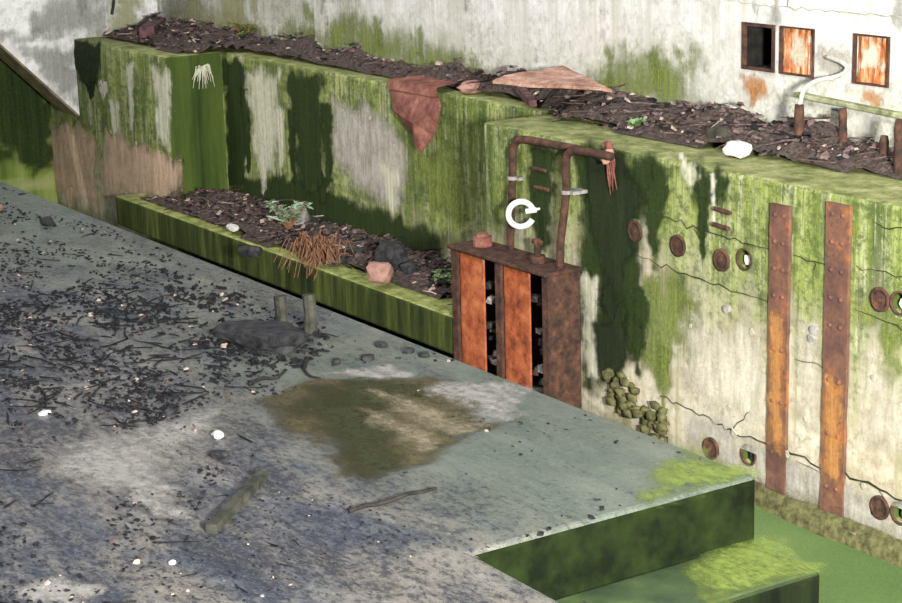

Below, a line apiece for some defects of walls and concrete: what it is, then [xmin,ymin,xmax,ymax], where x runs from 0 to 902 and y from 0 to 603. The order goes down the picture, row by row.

damp [0,58,53,171]
damp [152,66,185,201]
damp [222,56,442,258]
damp [527,145,555,251]
damp [574,139,671,390]
efflorescence [335,365,412,378]
damp [656,347,671,407]
crack [660,396,767,445]
rust [768,314,785,452]
crack [788,451,820,473]
rust [823,374,843,480]
crack [845,472,902,505]